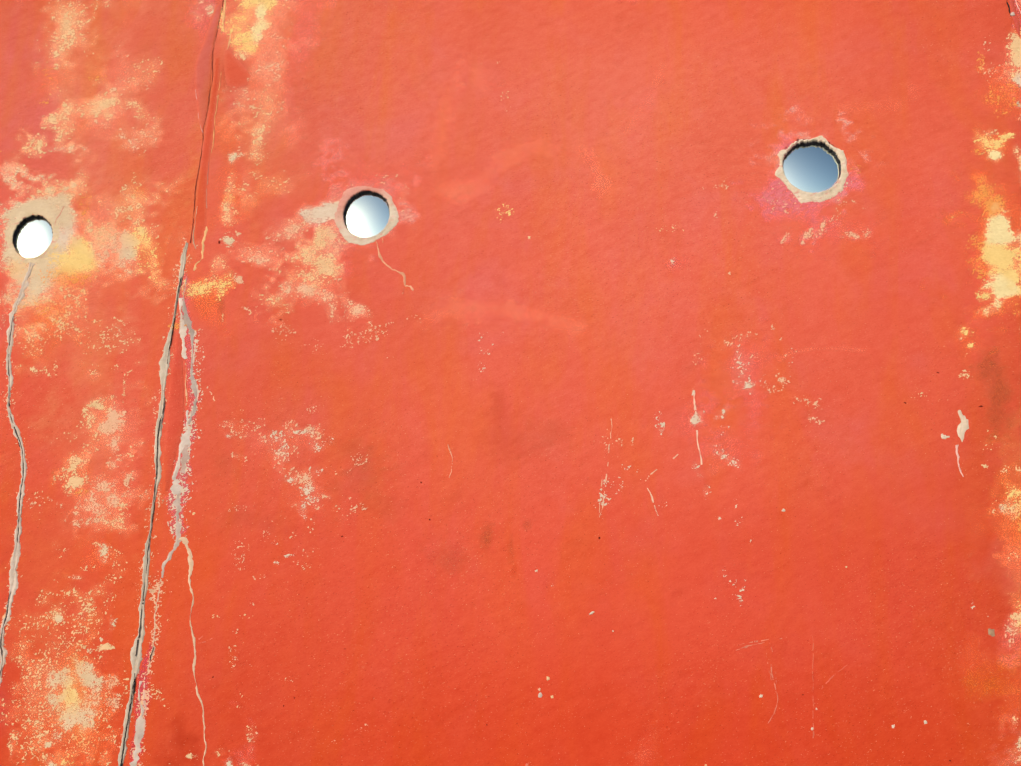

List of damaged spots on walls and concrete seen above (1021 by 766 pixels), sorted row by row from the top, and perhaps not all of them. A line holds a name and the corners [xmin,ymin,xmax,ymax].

crack [0,262,36,686]
peeling [0,362,143,766]
peeling [0,0,168,376]
crack [113,0,231,766]
peeling [219,418,333,533]
peeling [182,0,411,348]
peeling [964,176,1021,317]
peeling [987,601,1021,665]
peeling [992,465,1021,561]
crack [1006,0,1021,29]